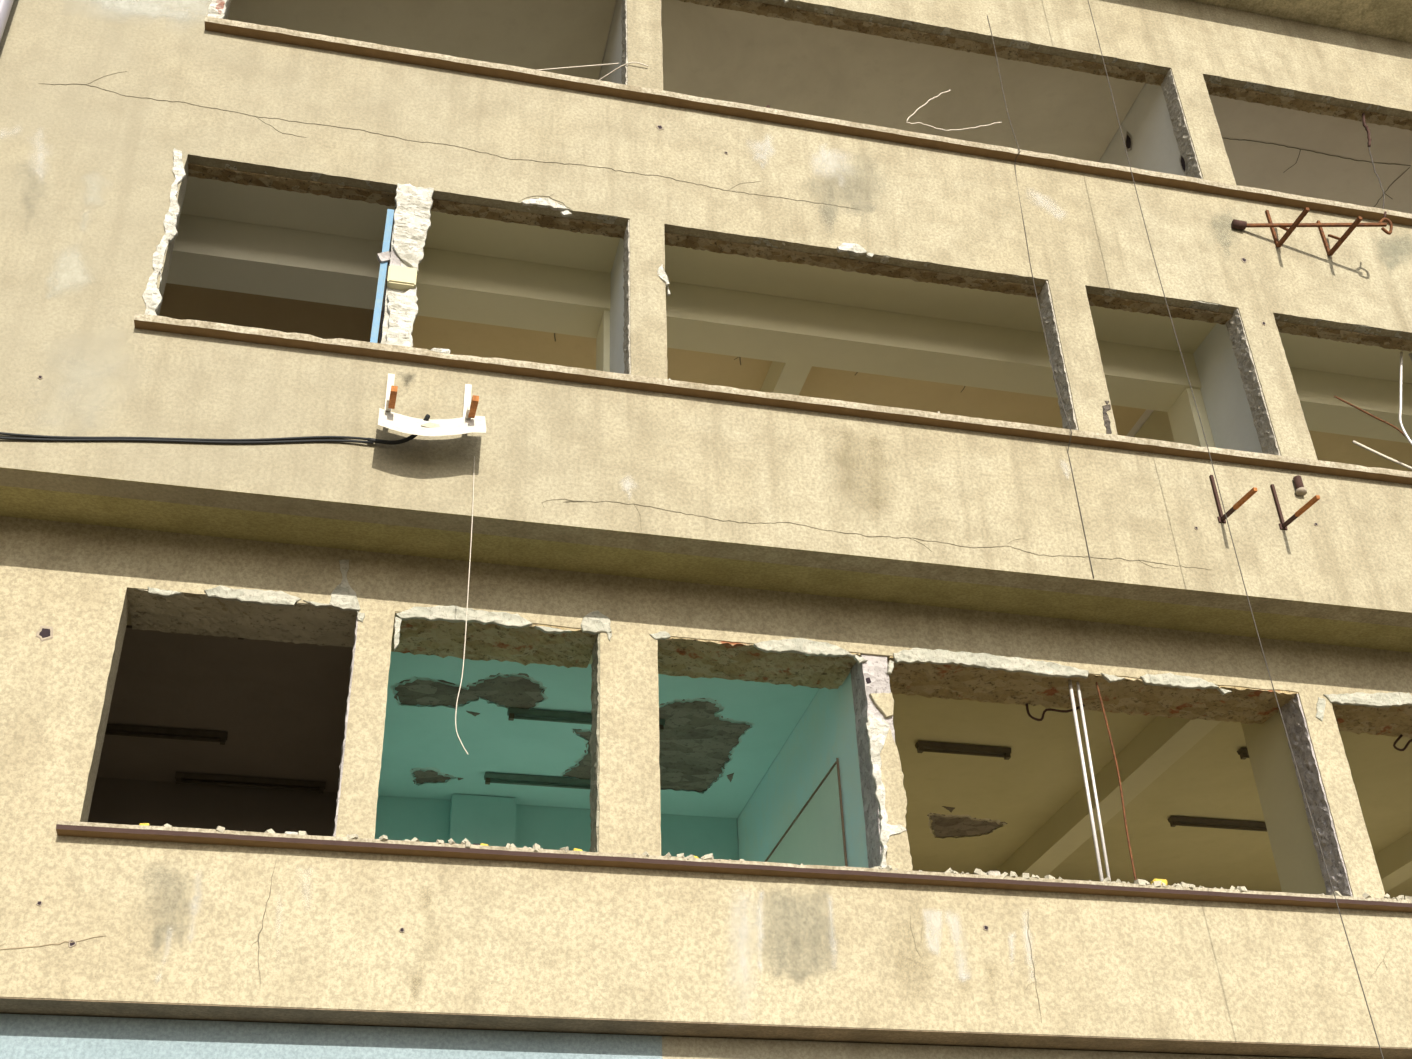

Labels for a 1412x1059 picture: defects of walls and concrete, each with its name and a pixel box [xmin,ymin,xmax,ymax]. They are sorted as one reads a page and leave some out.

crack [39,71,861,212]
crack [1224,138,1411,207]
flaking render [142,148,186,315]
peeling [385,287,418,347]
crack [543,499,1211,570]
peeling [409,767,463,786]
peeling [390,673,548,716]
peeling [560,729,592,780]
peeling [659,697,755,793]
peeling [866,714,890,734]
crack [251,863,276,973]